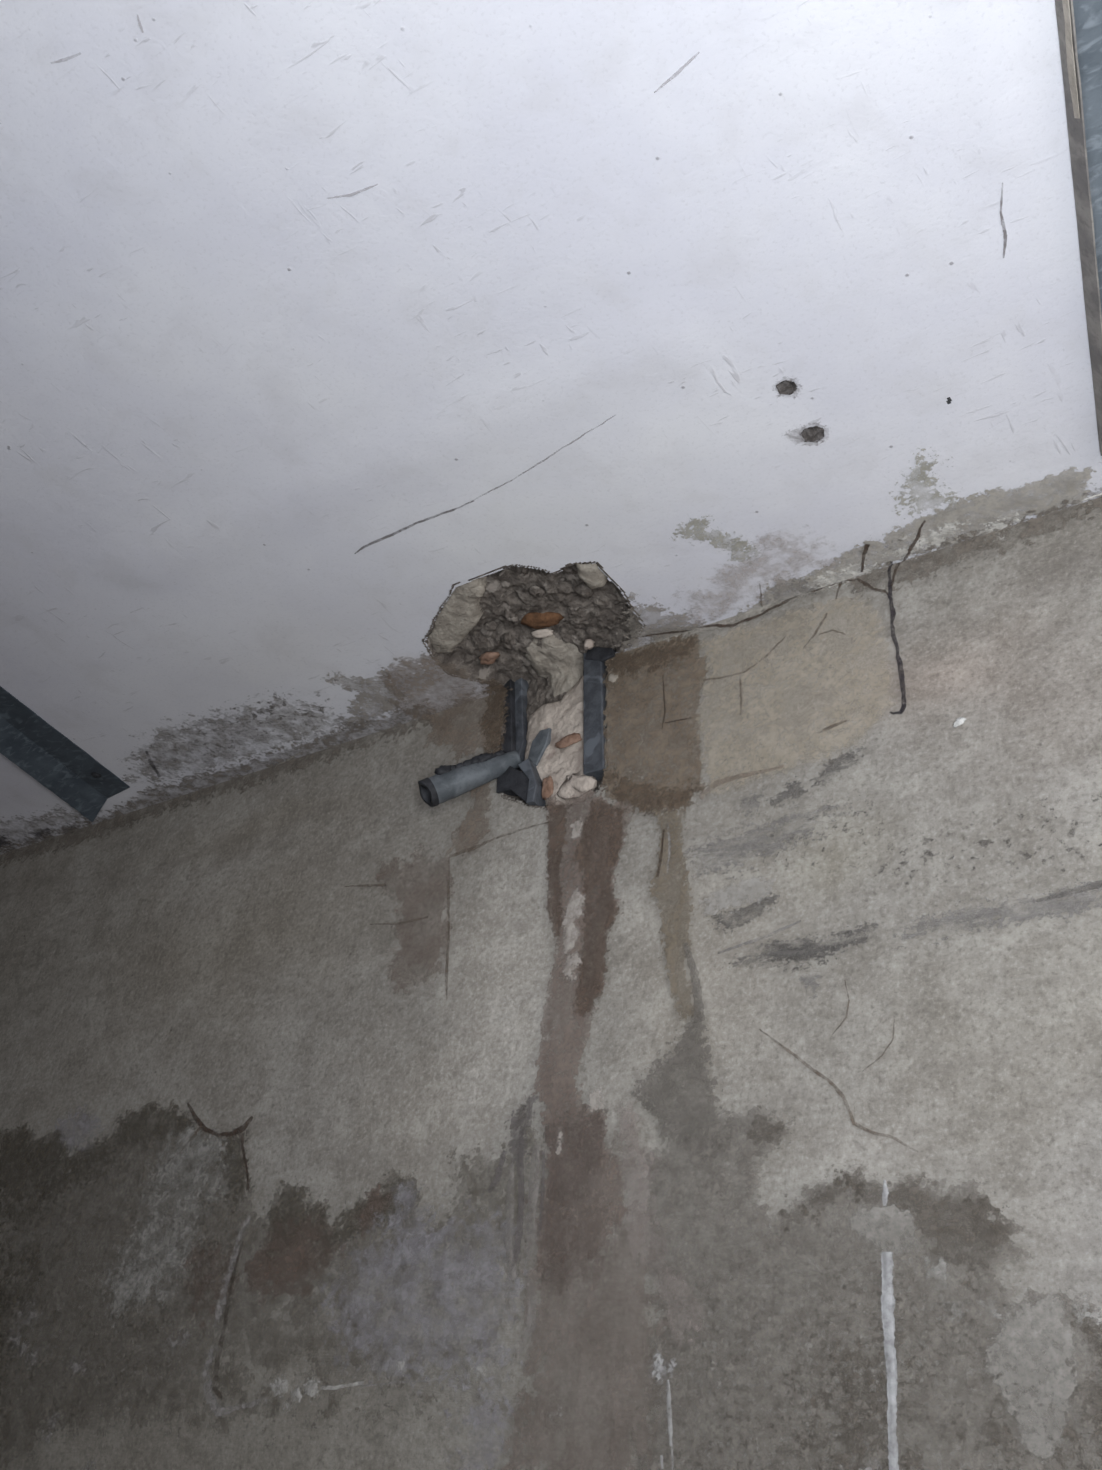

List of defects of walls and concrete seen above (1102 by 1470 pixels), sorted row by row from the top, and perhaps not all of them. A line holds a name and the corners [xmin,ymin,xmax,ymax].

water stain [0,651,509,868]
crack [354,417,611,554]
spalling [422,467,1097,810]
crack [642,520,926,714]
water stain [600,519,1102,1470]
water stain [0,1095,545,1470]